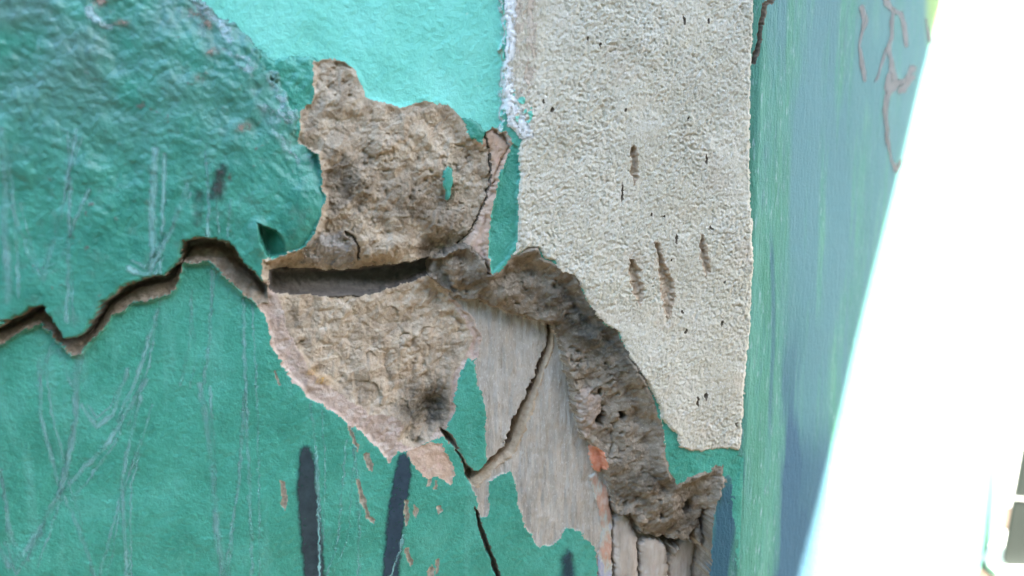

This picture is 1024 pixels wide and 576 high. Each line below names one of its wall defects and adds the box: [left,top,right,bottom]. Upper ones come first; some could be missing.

crack [0,134,492,356]
spalling [257,58,727,576]
crack [439,324,557,576]